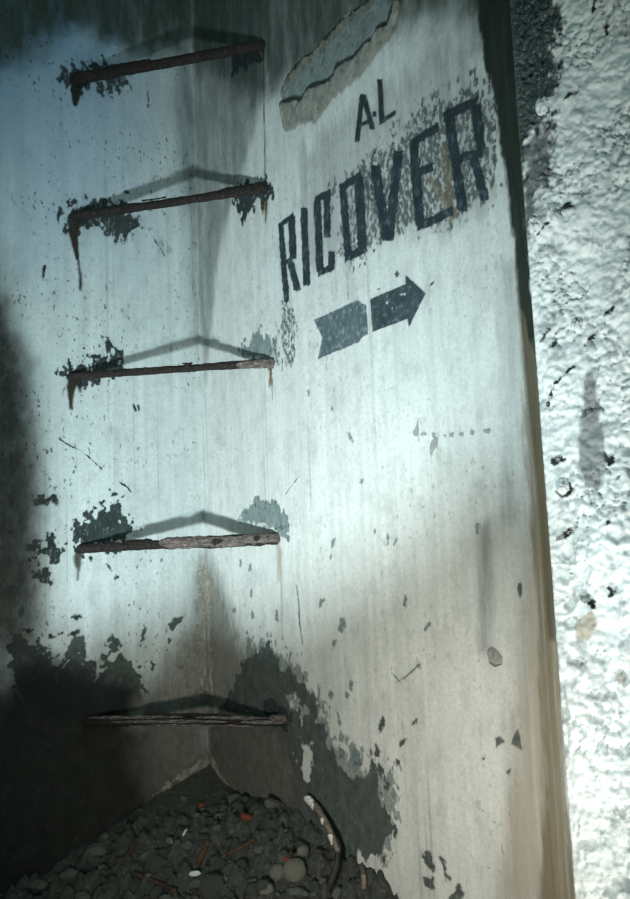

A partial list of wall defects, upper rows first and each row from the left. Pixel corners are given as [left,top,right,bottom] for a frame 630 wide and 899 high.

rust [71,84,85,106]
peeling [56,54,132,99]
flaking render [279,0,399,131]
peeling [57,190,143,244]
rust [69,220,83,290]
rust [67,370,81,409]
peeling [30,488,142,586]
peeling [239,495,290,542]
peeling [6,614,155,708]
peeling [168,617,183,644]
leakage [0,564,295,894]
peeling [217,631,401,867]